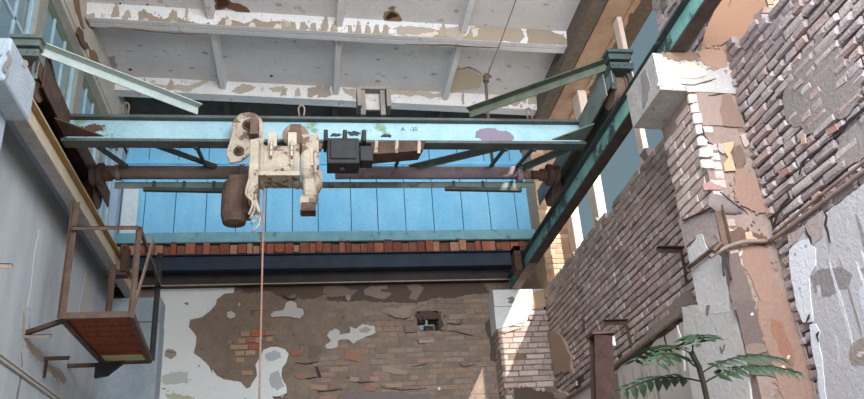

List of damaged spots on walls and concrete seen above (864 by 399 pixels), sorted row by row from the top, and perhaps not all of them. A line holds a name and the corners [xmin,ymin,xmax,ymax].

spalling [73,0,100,63]
spalling [214,0,250,13]
spalling [383,6,402,22]
flaking render [658,0,767,172]
crack [772,107,864,231]
flaking render [159,288,304,399]
flaking render [325,324,376,362]
flaking render [325,286,391,302]
spalling [417,318,437,343]
flaking render [614,212,776,399]
flaking render [777,183,864,399]
flaking render [556,386,591,399]